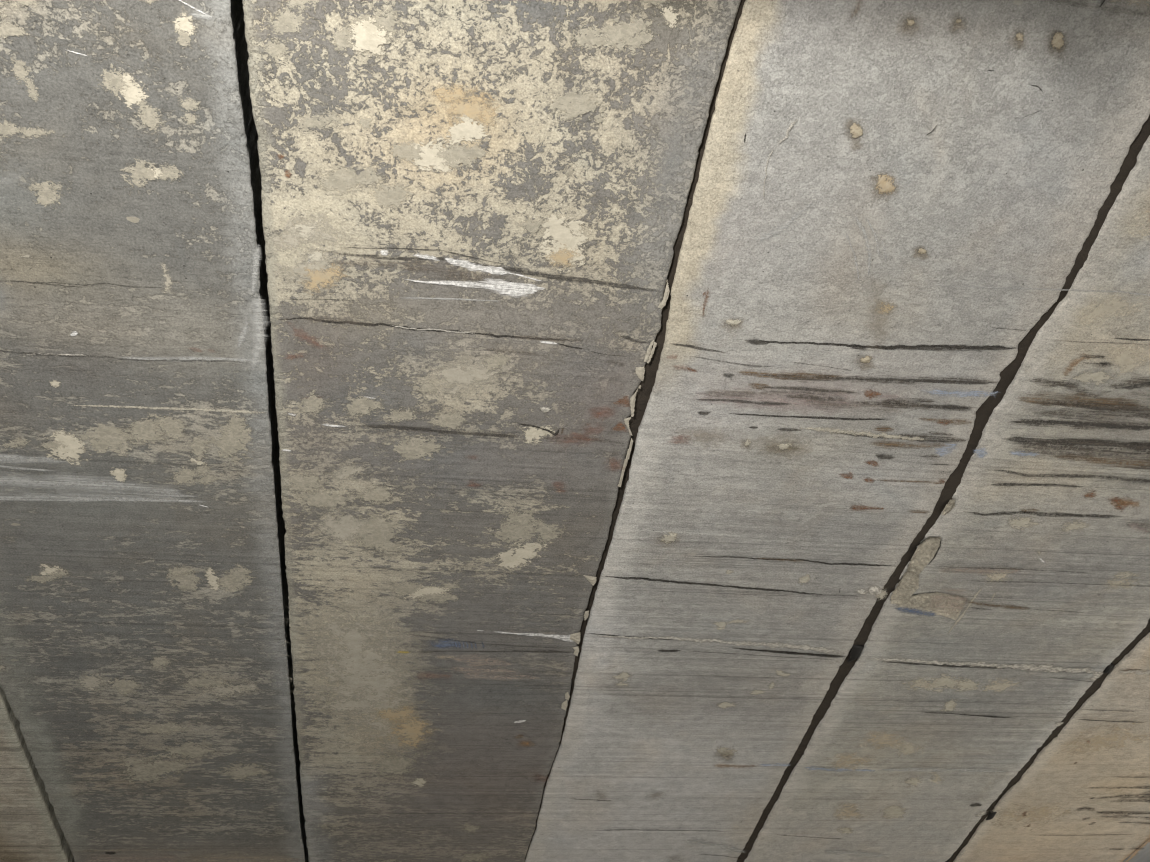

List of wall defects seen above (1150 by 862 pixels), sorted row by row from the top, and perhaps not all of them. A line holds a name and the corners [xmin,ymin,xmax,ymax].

water stain [319,247,654,291]
crack [279,299,580,341]
crack [745,327,1019,351]
peeling [521,406,564,444]
spalling [618,340,657,487]
spalling [835,537,966,620]
spalling [570,611,589,656]